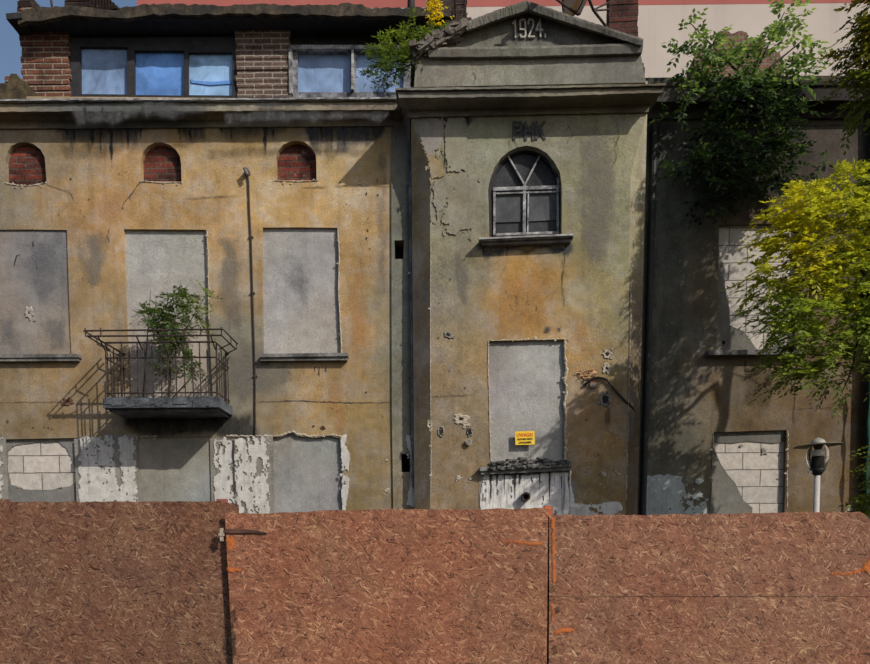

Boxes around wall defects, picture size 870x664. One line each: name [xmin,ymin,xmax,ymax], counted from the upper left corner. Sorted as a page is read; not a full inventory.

water stain [57,128,143,160]
spalling [427,246,459,493]
peeling [453,284,632,515]
peeling [0,426,157,502]
peeling [210,425,351,513]
peeling [646,430,789,515]